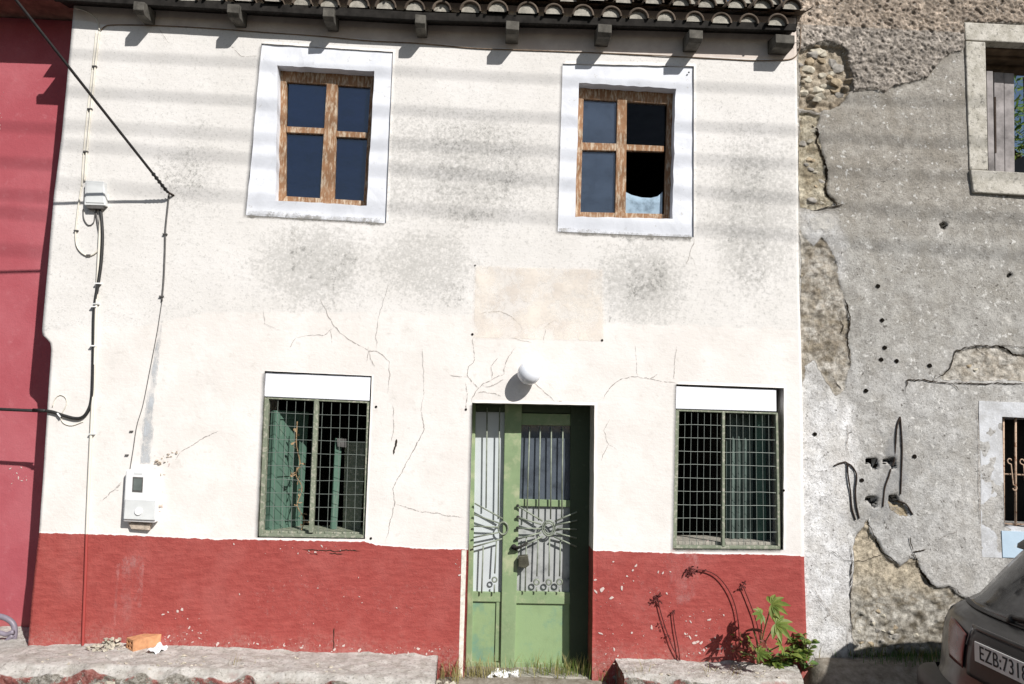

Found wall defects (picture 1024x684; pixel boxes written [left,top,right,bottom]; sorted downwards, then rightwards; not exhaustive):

peeling [797,0,1024,211]
crack [263,287,390,385]
spalling [799,230,851,395]
spalling [941,347,1024,382]
spalling [865,458,897,469]
spalling [865,495,908,516]
spalling [850,522,965,657]